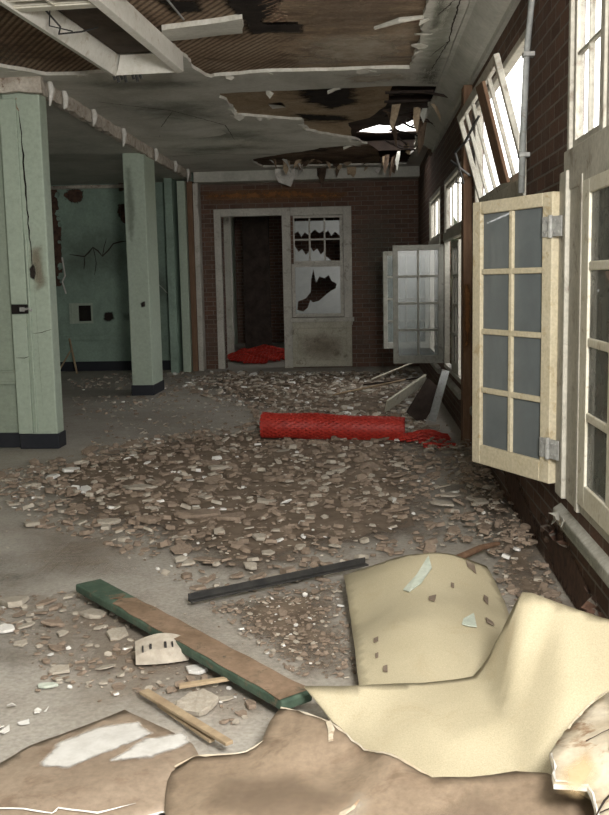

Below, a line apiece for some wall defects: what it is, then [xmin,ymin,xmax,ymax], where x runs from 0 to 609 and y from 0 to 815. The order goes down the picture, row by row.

flaking render [0,6,101,77]
spalling [58,8,151,54]
flaking render [127,0,235,33]
flaking render [171,0,433,80]
crack [430,0,461,71]
flaking render [220,86,396,177]
crack [16,104,49,415]
spalling [51,189,83,294]
crack [69,238,125,275]